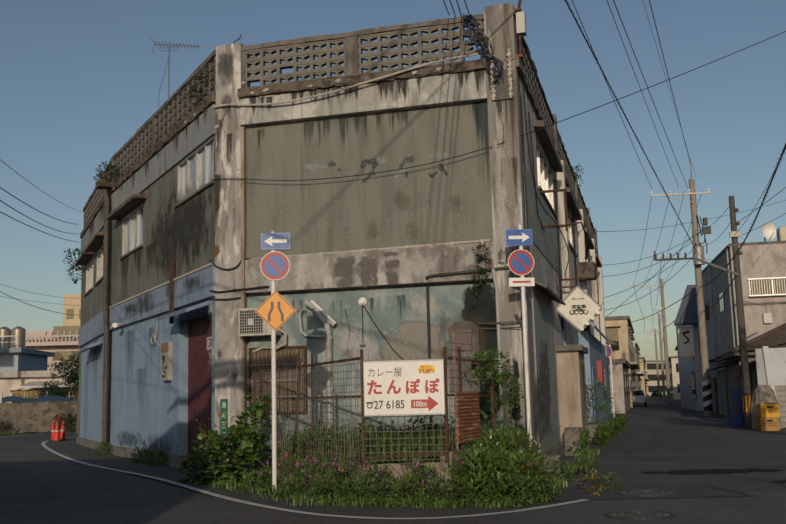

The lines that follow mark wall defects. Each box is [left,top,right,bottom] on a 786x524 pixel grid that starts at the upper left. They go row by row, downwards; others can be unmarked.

water stain [249,96,272,112]
water stain [292,85,358,104]
water stain [378,79,407,96]
water stain [217,120,232,155]
water stain [122,188,207,277]
water stain [335,252,400,288]